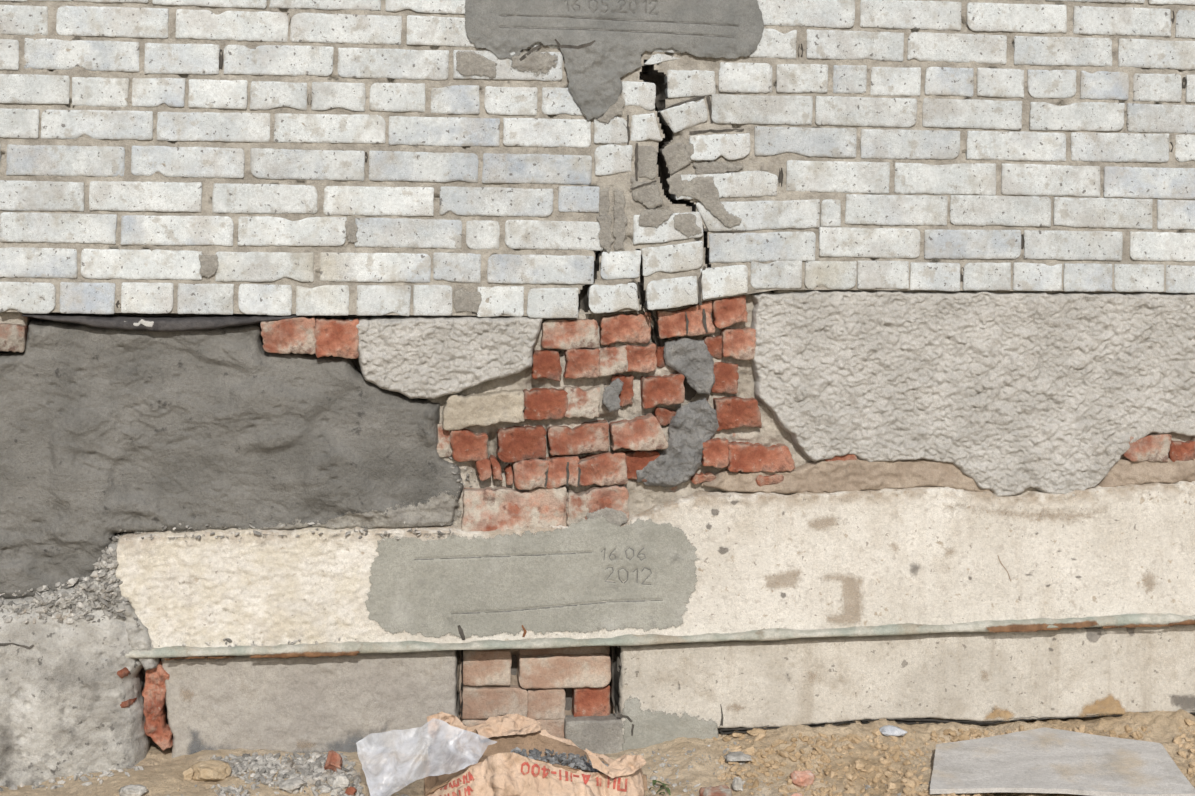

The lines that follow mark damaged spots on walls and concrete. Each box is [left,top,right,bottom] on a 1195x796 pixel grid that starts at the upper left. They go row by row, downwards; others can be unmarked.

crack [578,250,603,312]
crack [627,64,747,348]